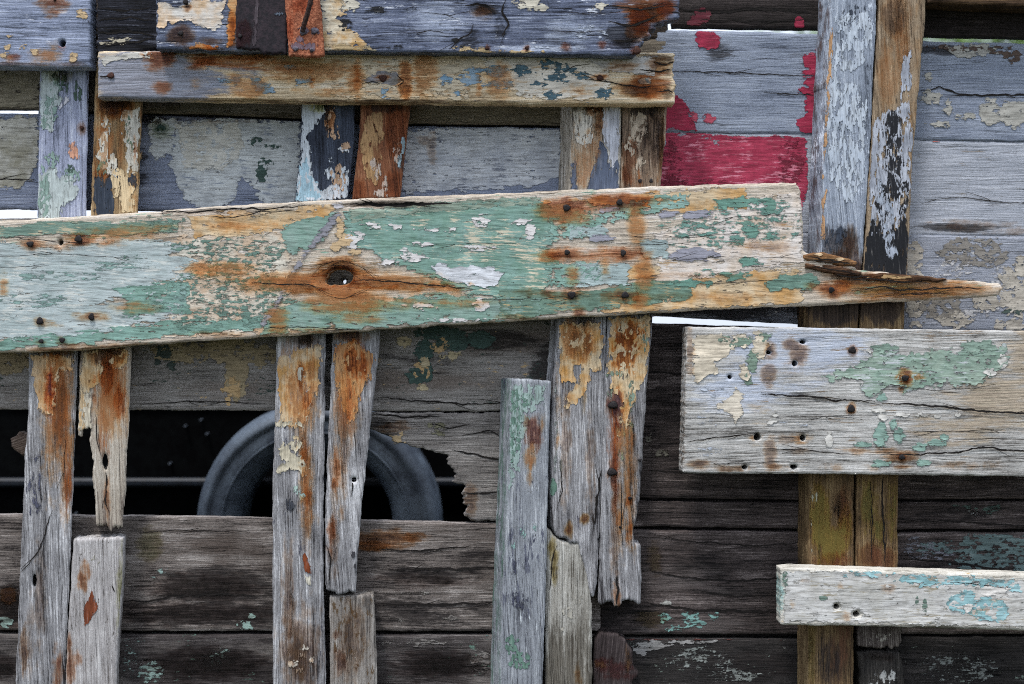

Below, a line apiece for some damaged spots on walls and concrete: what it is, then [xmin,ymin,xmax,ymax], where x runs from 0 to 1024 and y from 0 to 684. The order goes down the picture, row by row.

corrosion [188,258,434,320]
peeling [0,0,1024,516]
corrosion [561,308,592,355]
corrosion [541,195,649,233]
corrosion [616,322,644,366]
crack [618,212,981,297]
corrosion [44,359,73,472]
crack [652,384,1024,588]
peeling [782,533,1024,644]